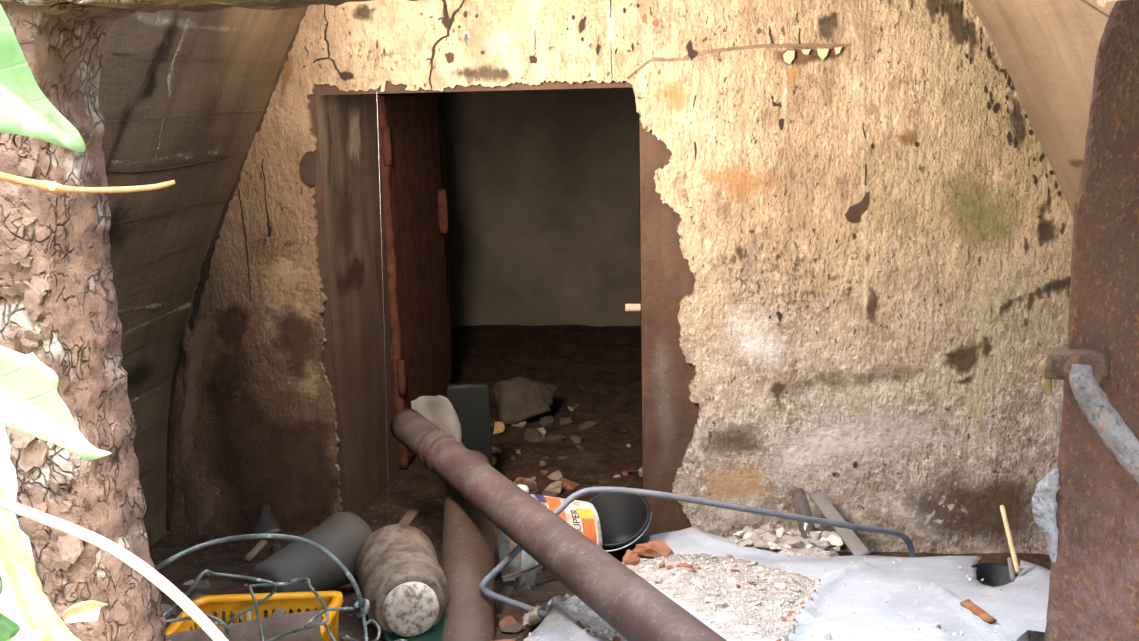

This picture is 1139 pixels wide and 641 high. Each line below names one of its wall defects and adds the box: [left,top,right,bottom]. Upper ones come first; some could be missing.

crack [303,4,340,74]
crack [426,0,465,89]
crack [627,26,851,79]
leakage [910,0,1033,148]
leakage [1024,153,1064,254]
spalling [636,110,700,536]
peeling [180,314,213,468]
leakage [207,310,334,528]
peeling [697,459,776,526]